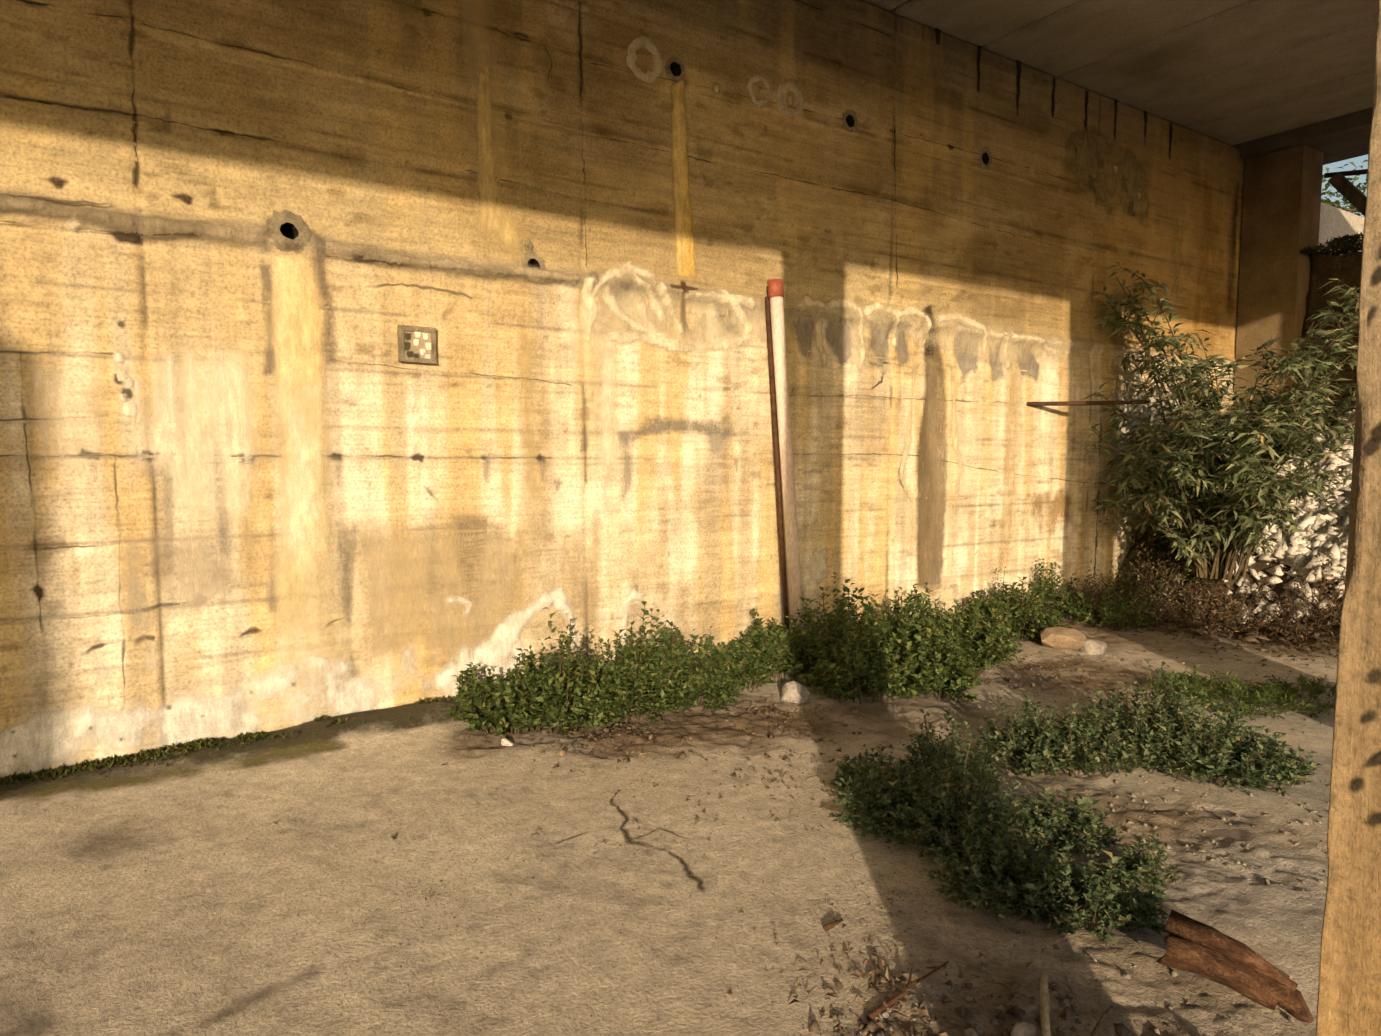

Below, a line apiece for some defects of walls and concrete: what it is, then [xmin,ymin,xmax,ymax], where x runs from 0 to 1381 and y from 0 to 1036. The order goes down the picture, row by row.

crack [18,0,51,8]
crack [99,13,305,63]
crack [6,91,274,186]
water stain [477,70,524,249]
water stain [0,234,584,794]
crack [556,790,704,890]